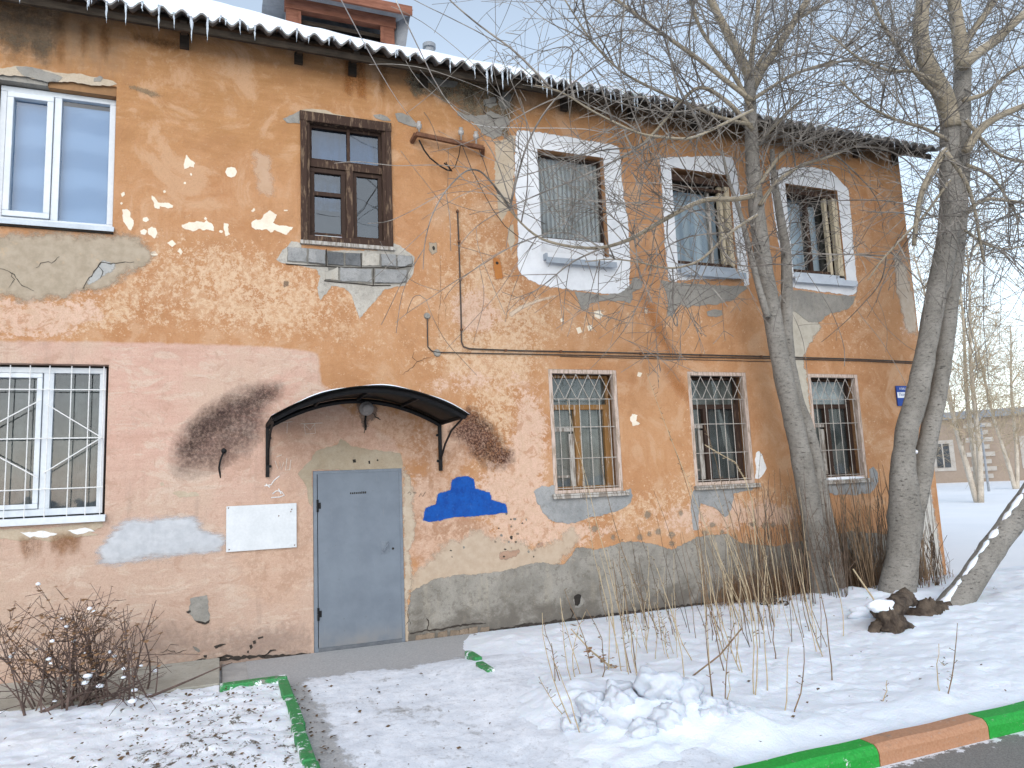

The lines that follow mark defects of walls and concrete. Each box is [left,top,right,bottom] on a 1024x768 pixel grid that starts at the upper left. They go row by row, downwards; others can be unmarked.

flaking render [0,190,173,303]
crack [83,262,132,289]
peeling [182,217,230,236]
spalling [251,208,415,318]
flaking render [793,311,821,418]
spalling [187,595,210,624]
spalling [408,513,810,641]